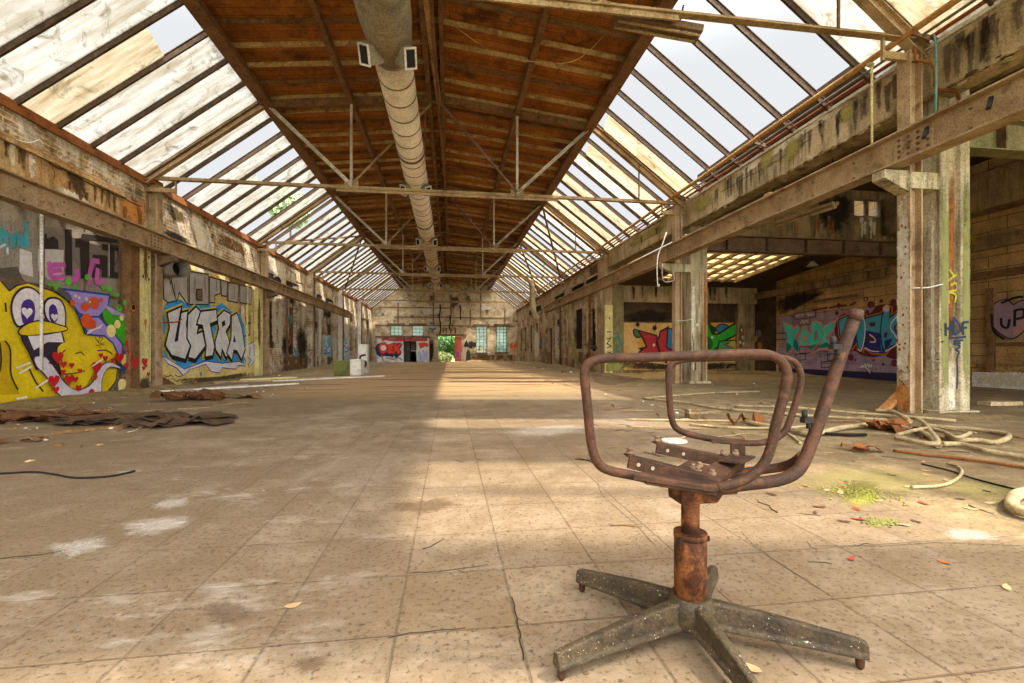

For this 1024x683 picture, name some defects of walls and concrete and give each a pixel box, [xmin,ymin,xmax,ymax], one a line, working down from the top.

damp [1012,0,1023,27]
damp [943,13,999,83]
crack [511,597,527,661]